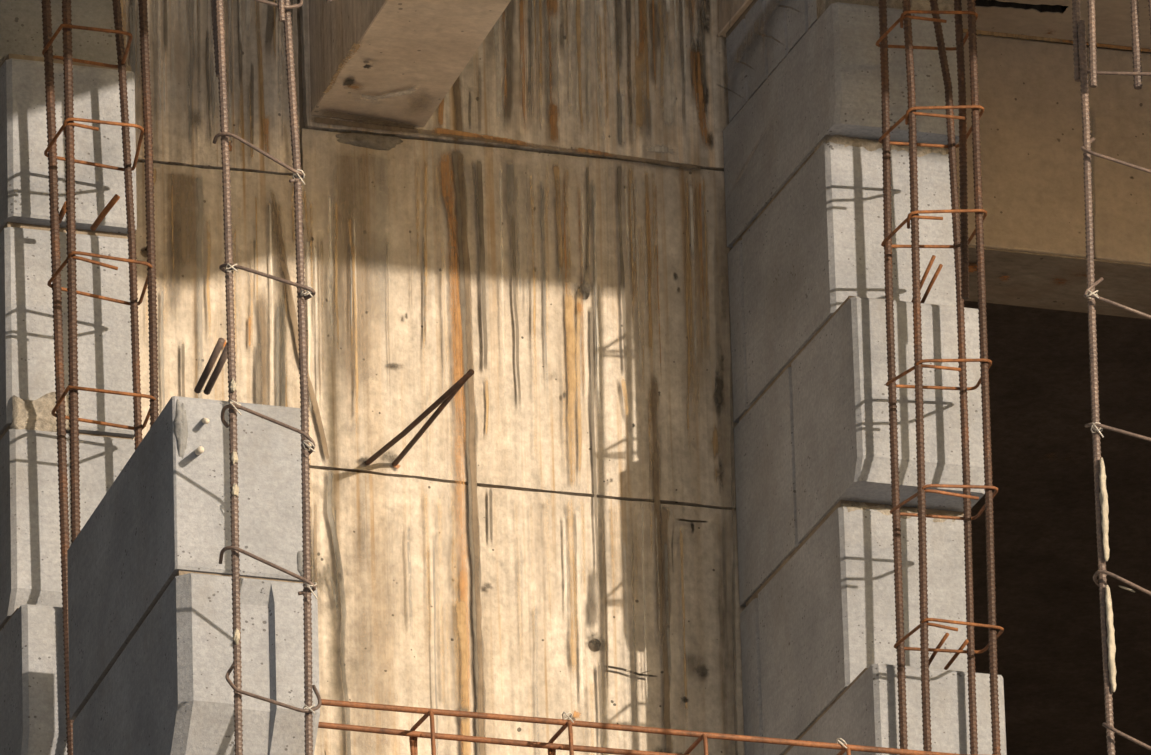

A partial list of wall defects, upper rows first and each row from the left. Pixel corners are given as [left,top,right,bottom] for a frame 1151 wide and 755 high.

damp [187,0,254,141]
damp [266,0,279,82]
rust [690,50,707,143]
damp [171,173,211,376]
damp [181,343,202,399]
damp [234,181,368,459]
damp [312,473,351,755]
rust [441,154,471,755]
rust [312,99,700,429]
rust [568,511,577,666]
rust [565,289,582,482]
rust [648,378,663,635]